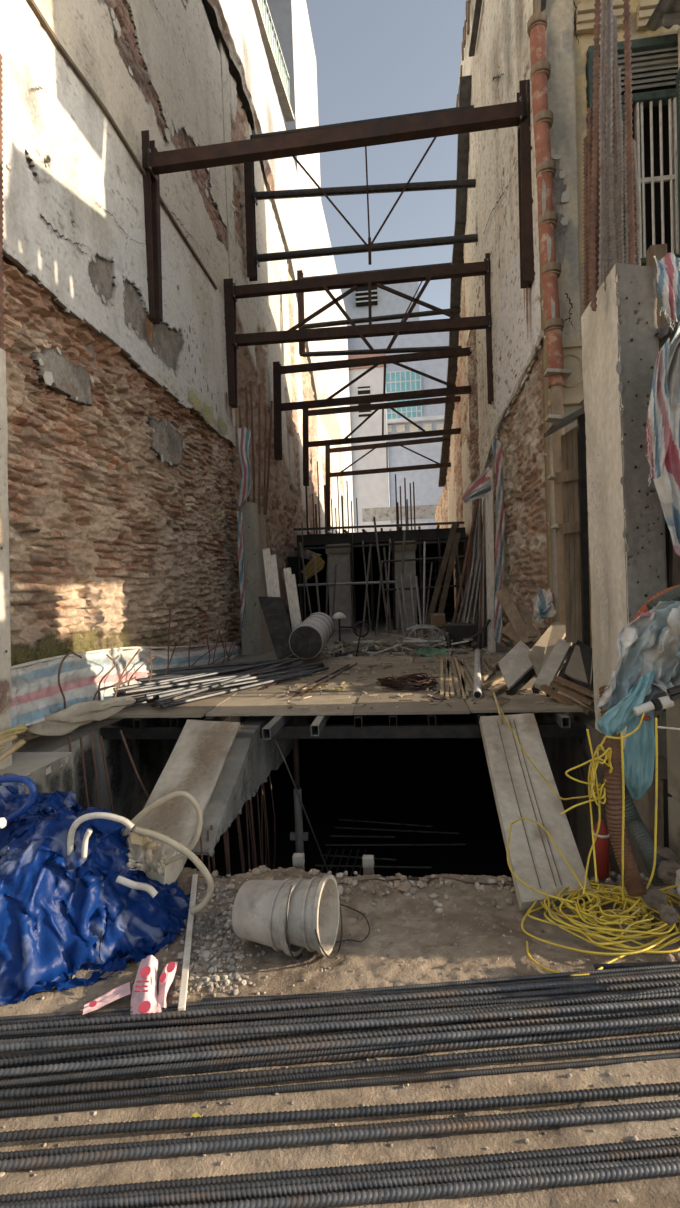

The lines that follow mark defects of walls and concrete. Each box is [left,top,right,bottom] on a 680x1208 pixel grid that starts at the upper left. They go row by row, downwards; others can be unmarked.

peeling [101,0,196,149]
peeling [190,168,246,248]
peeling [38,357,54,386]
flaking render [88,254,217,413]